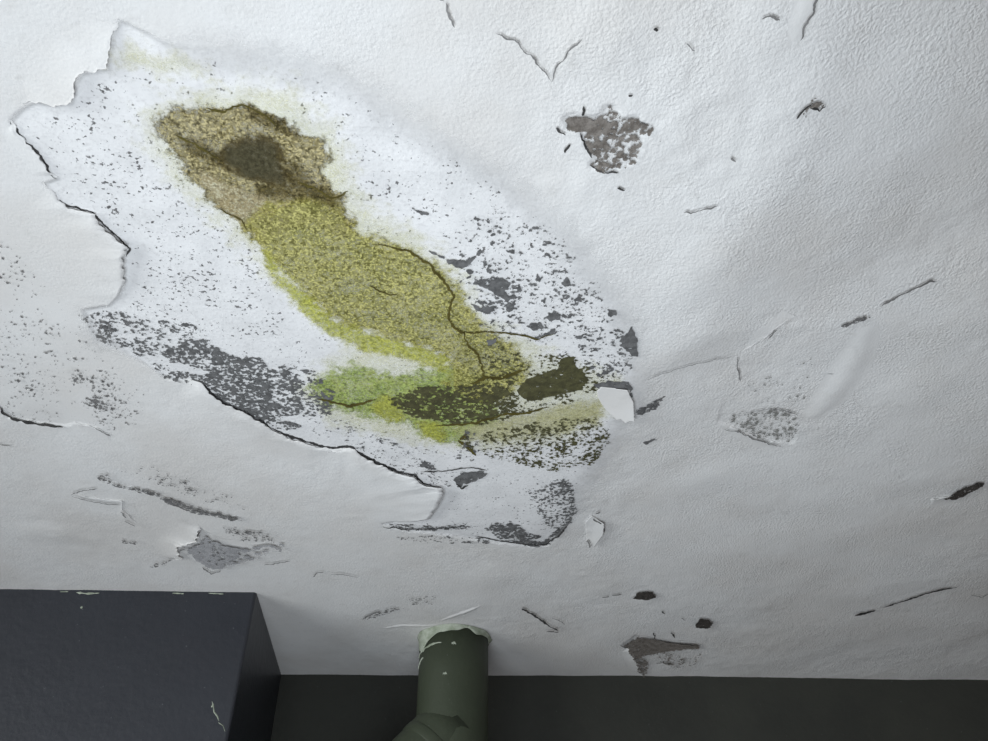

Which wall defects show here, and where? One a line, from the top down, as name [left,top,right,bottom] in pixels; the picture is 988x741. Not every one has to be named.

peeling [0,18,665,548]
leakage [154,104,601,442]
crack [374,244,553,380]
peeling [721,311,879,450]
peeling [152,522,289,575]
peeling [930,483,985,507]
peeling [620,633,701,678]